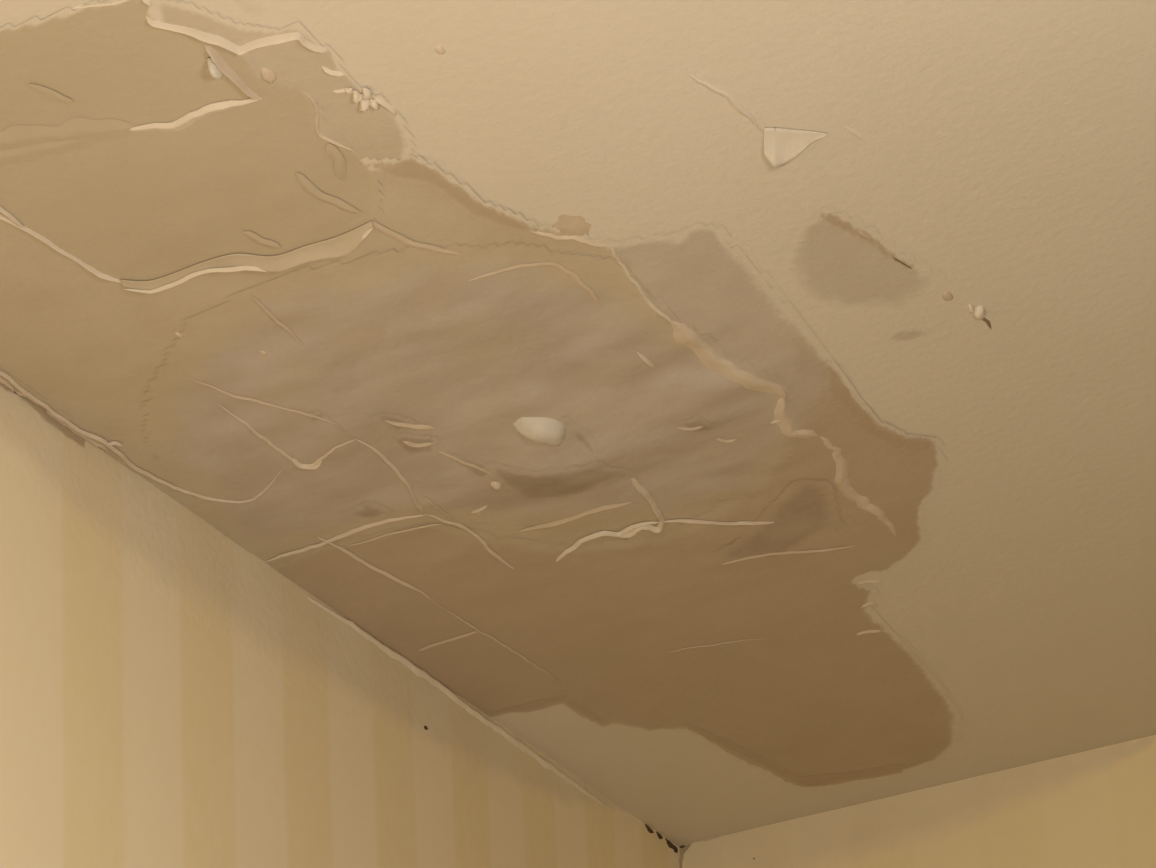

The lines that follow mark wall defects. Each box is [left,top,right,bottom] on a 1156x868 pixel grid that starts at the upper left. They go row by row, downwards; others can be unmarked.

peeling [0,0,416,294]
peeling [0,377,110,454]
damp [0,153,964,823]
peeling [531,214,896,536]
damp [645,735,1156,868]